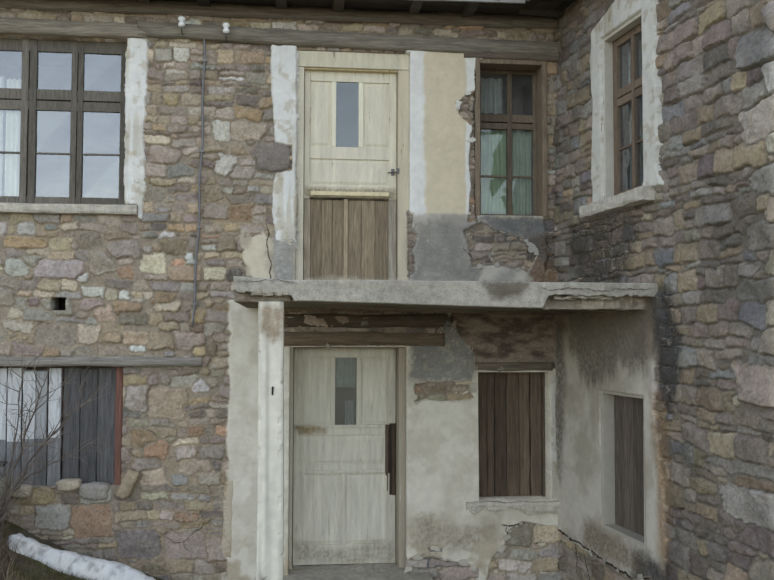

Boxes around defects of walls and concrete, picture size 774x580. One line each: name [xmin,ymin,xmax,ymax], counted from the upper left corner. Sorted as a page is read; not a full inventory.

flaking render [454,90,539,272]
water stain [389,222,491,286]
water stain [485,217,555,261]
water stain [484,281,527,298]
flaking render [235,290,647,372]
flaking render [410,381,476,405]
water stain [555,290,681,468]
flaking render [404,521,652,580]